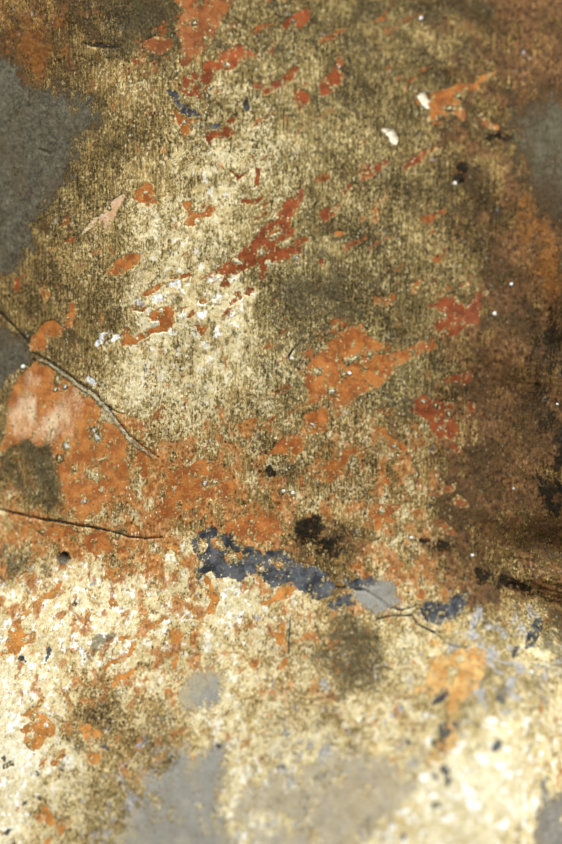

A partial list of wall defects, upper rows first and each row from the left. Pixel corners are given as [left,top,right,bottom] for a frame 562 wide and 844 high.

peeling [131,0,252,100]
peeling [171,98,250,146]
leakage [486,131,512,142]
peeling [231,167,263,205]
leakage [455,160,469,183]
crack [0,313,158,459]
leakage [526,306,562,516]
crack [0,509,160,540]
leakage [419,537,457,552]
peeling [191,577,220,620]
flaking render [327,562,405,617]
leakage [471,567,532,593]